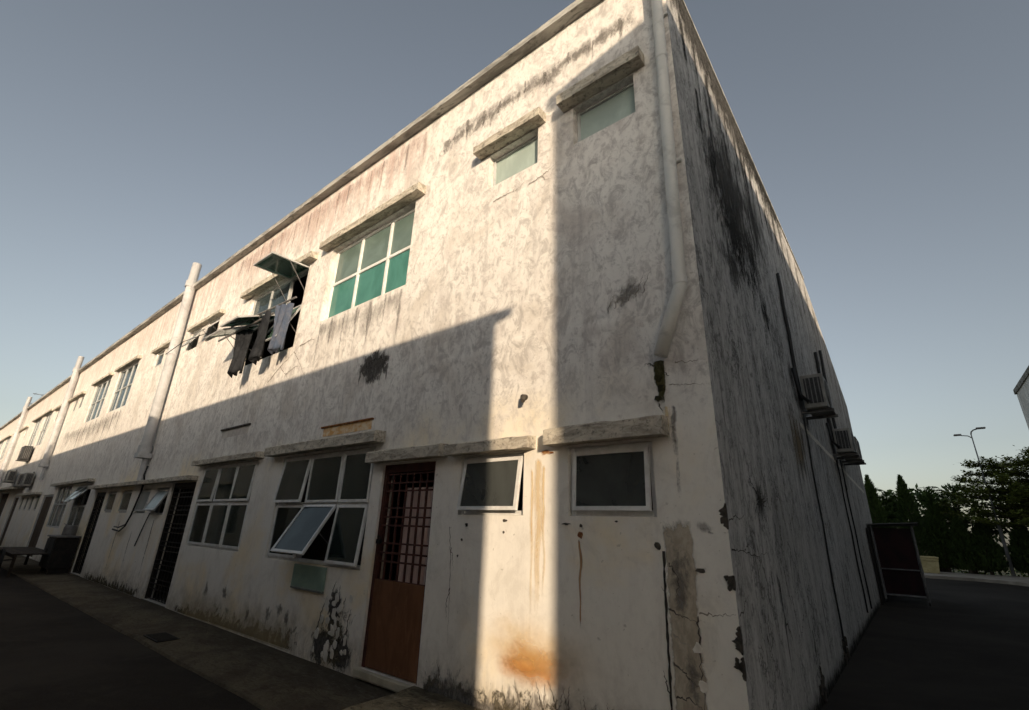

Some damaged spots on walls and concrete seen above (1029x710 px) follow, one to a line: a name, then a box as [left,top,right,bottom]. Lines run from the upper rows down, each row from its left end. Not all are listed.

leakage [673,0,851,430]
leakage [358,350,389,384]
crack [732,469,804,678]
peeling [311,581,353,671]
leakage [423,665,570,710]
corrosion [509,648,554,682]
crack [654,542,673,710]